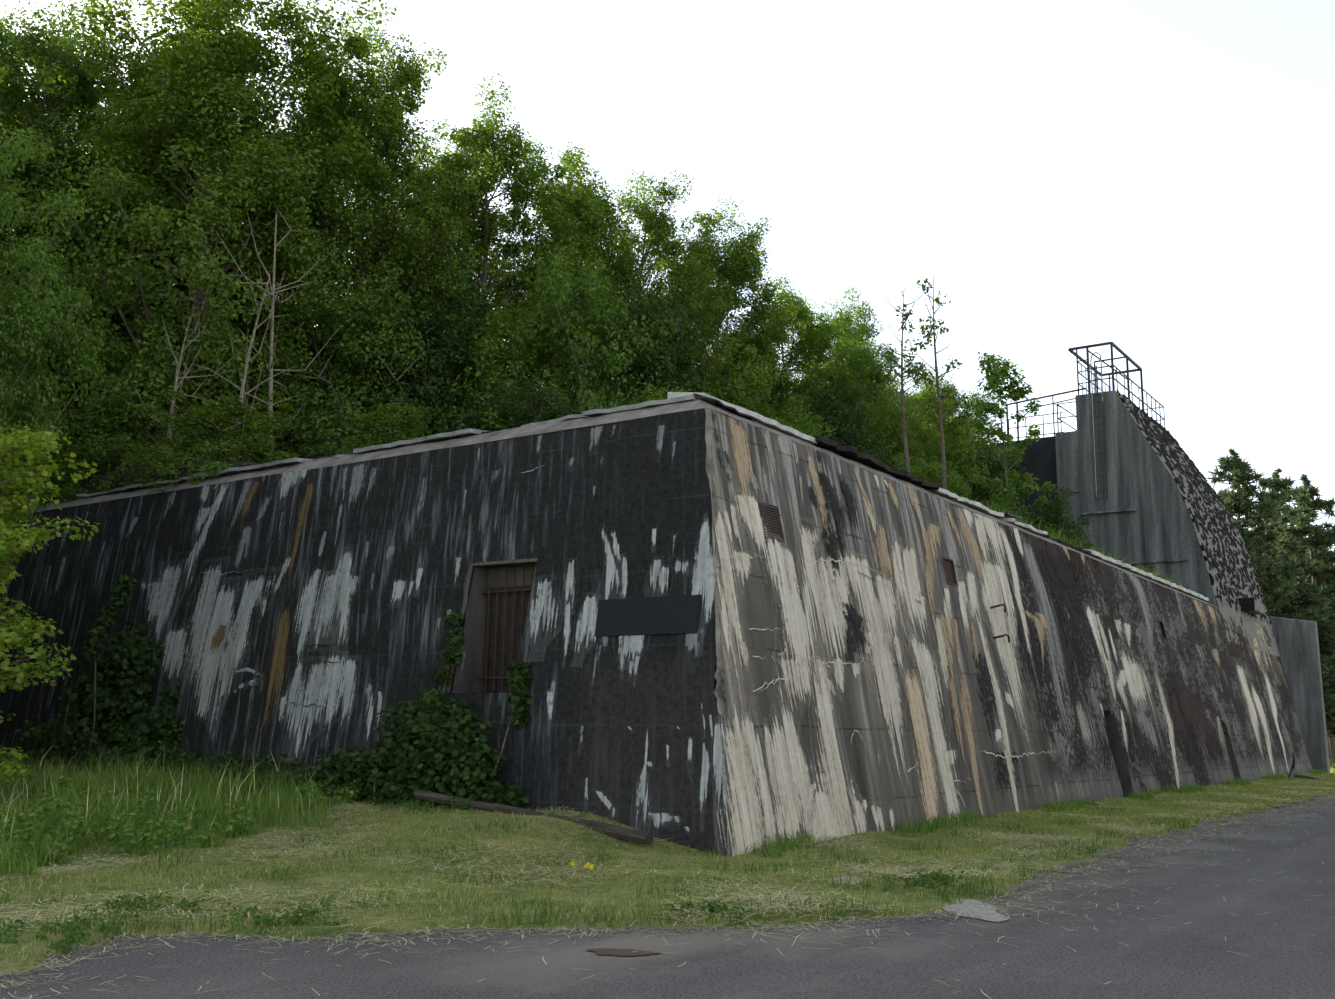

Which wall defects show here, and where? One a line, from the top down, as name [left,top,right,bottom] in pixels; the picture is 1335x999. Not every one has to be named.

peeling [809,450,859,584]
spalling [234,667,256,693]
crack [749,628,786,692]
peeling [842,602,870,664]
peeling [972,651,1020,797]
crack [986,750,1044,758]